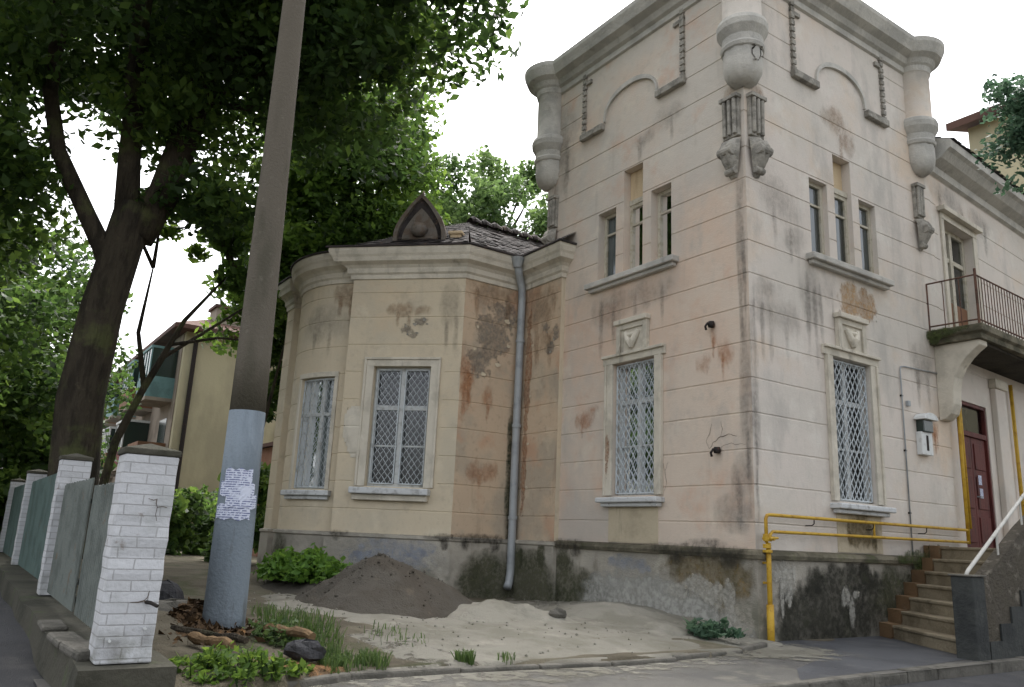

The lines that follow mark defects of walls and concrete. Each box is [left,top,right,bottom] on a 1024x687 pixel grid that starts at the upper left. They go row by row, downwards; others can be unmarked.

spalling [468,302,516,378]
damp [458,420,750,628]
peeling [668,573,737,626]
damp [778,563,922,641]